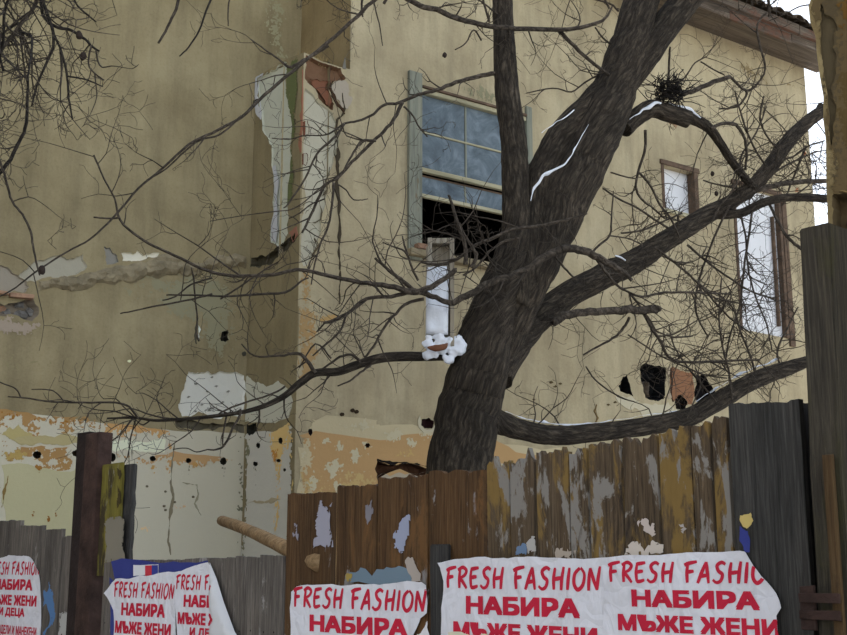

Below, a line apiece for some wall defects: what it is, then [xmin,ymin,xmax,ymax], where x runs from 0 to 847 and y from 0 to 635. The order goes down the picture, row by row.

peeling [820,4,837,145]
peeling [250,51,353,268]
spalling [832,193,847,229]
peeling [104,246,159,265]
peeling [0,255,87,321]
peeling [175,371,293,435]
spalling [607,363,715,417]
peeling [2,425,77,446]
peeling [112,439,166,453]
spalling [375,461,426,480]
peeling [1,463,75,536]